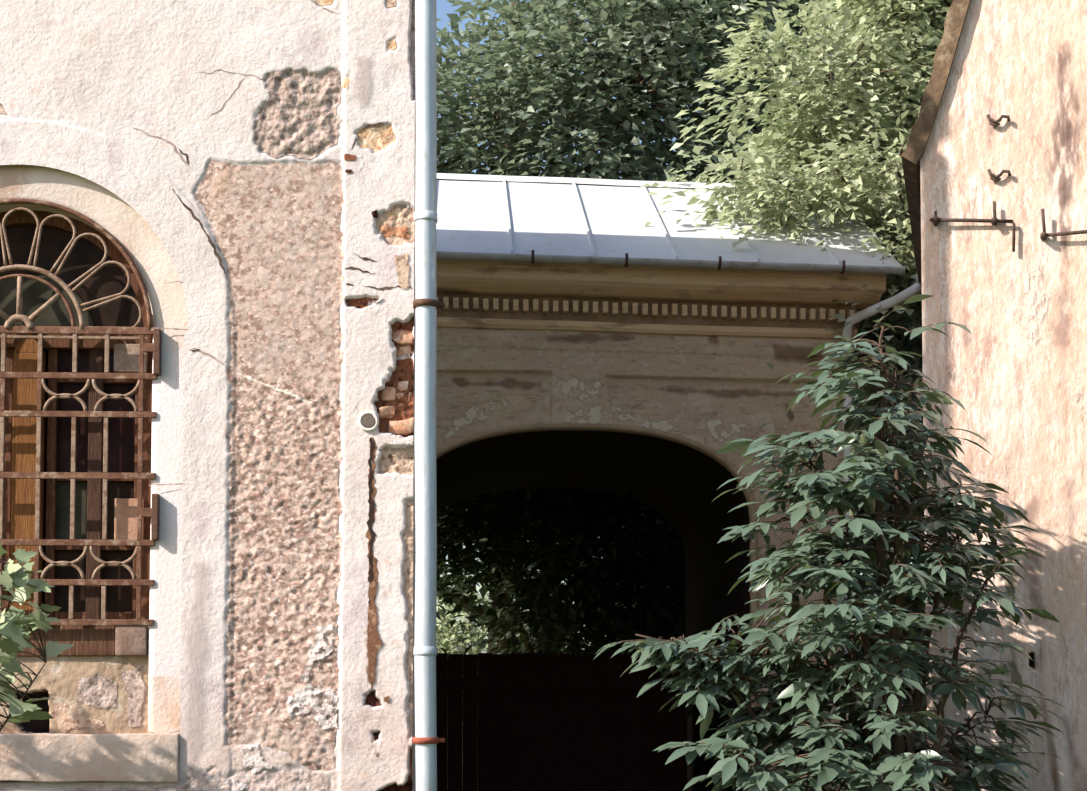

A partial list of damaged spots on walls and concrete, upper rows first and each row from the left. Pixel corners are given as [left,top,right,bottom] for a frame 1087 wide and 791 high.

crack [132,127,189,166]
crack [196,69,265,120]
spalling [253,69,350,159]
peeling [344,121,396,173]
crack [172,188,228,276]
flaking render [372,204,414,289]
flaking render [374,316,415,475]
crack [365,437,383,689]